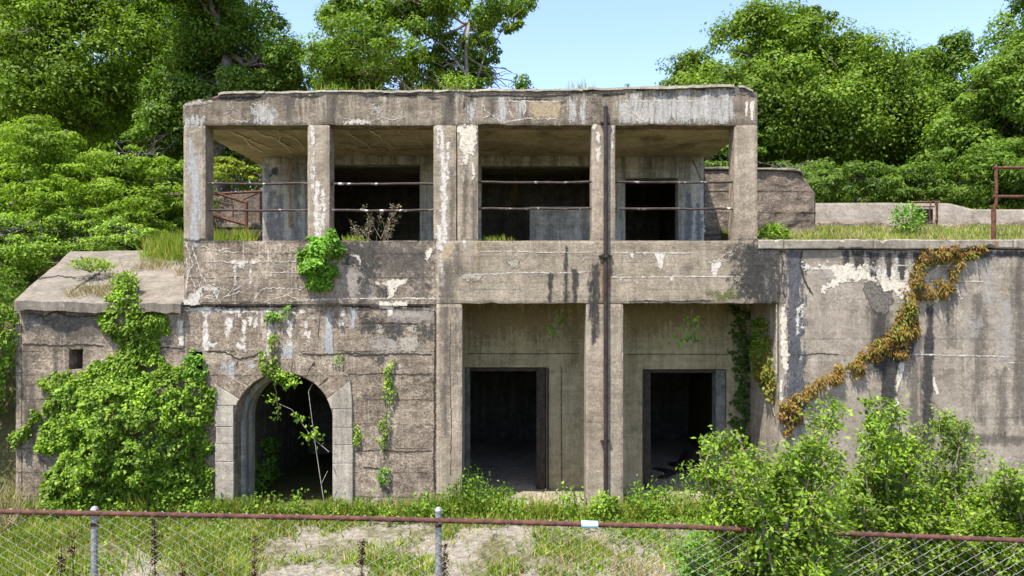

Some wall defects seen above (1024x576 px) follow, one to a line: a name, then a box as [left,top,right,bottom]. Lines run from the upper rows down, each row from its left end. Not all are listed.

peeling [457,124,490,192]
spalling [368,273,437,354]
leakage [463,246,600,367]
peeling [801,260,912,315]
leakage [842,249,921,282]
leakage [951,249,1024,261]
crack [183,241,579,490]
leakage [872,304,939,449]